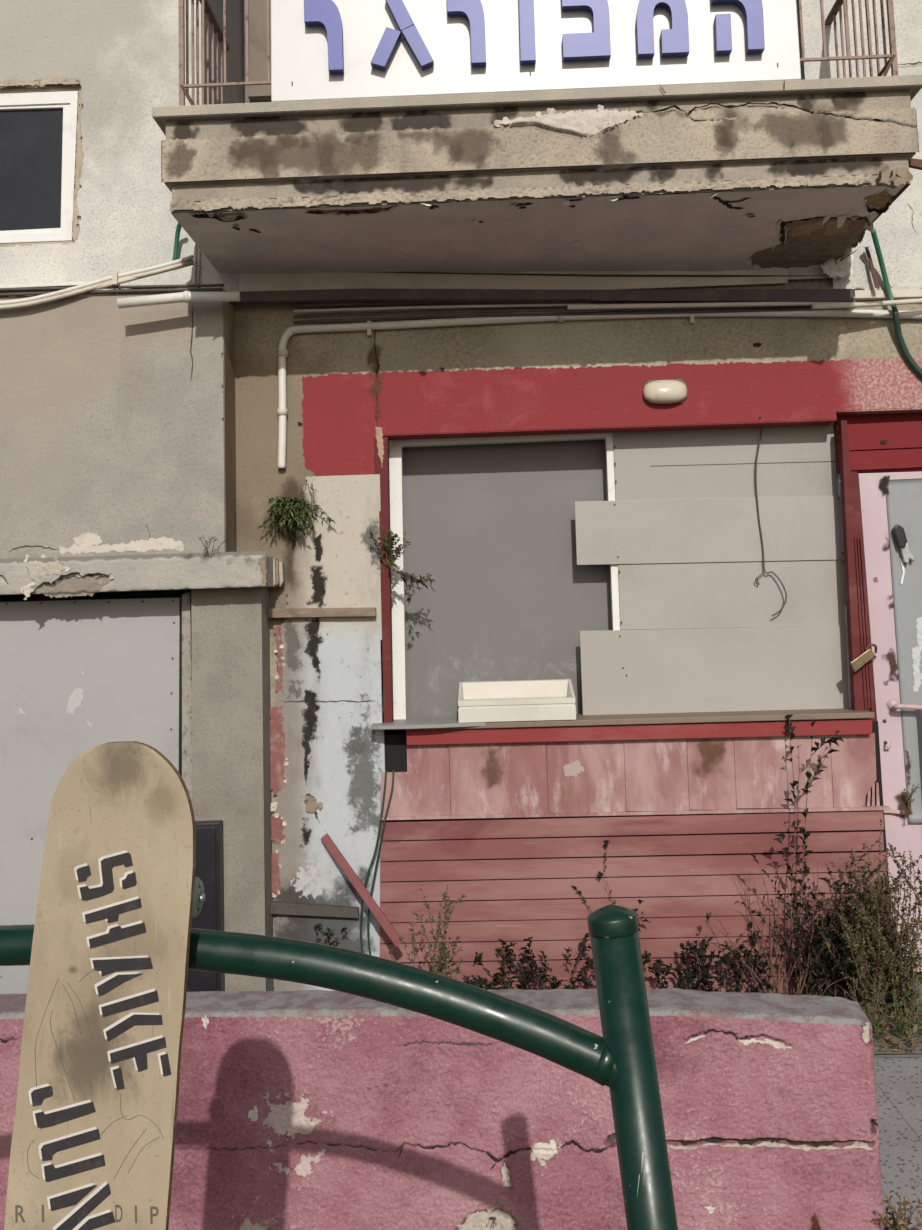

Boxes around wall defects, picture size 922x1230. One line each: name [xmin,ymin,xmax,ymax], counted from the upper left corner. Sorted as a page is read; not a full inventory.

water stain [170,122,199,176]
water stain [232,106,518,194]
spalling [494,105,643,140]
crack [642,81,912,128]
spalling [751,167,913,269]
peeling [0,532,184,600]
water stain [285,534,327,780]
water stain [344,695,384,832]
crack [686,1030,791,1045]
crack [180,1141,532,1170]
crack [667,1138,873,1151]
spalling [456,1208,520,1230]